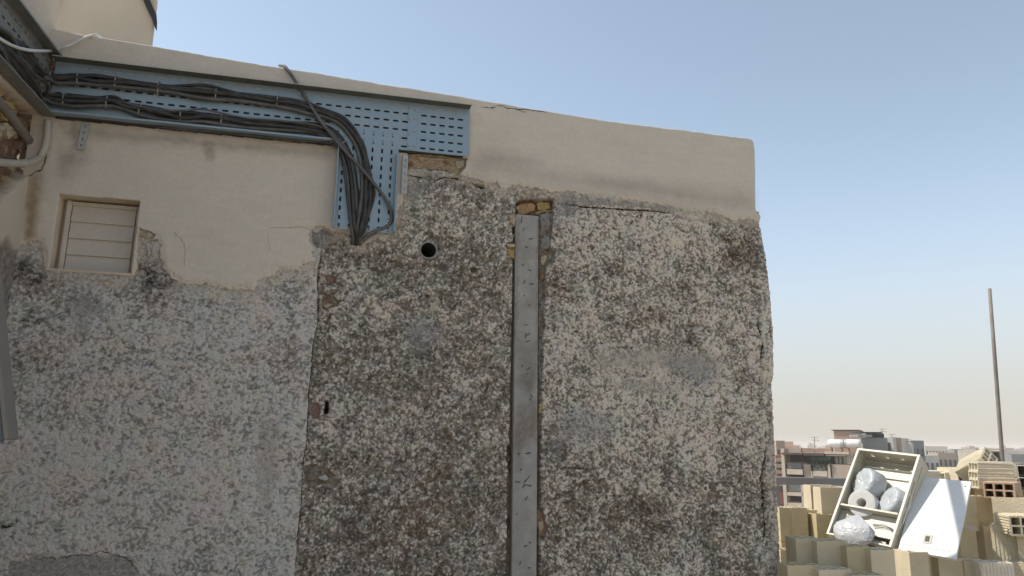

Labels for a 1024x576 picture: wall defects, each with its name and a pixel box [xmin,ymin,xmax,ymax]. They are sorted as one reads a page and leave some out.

crack [480,104,548,112]
spalling [407,154,466,176]
crack [566,204,672,216]
spalling [506,200,555,439]
crack [759,446,768,538]